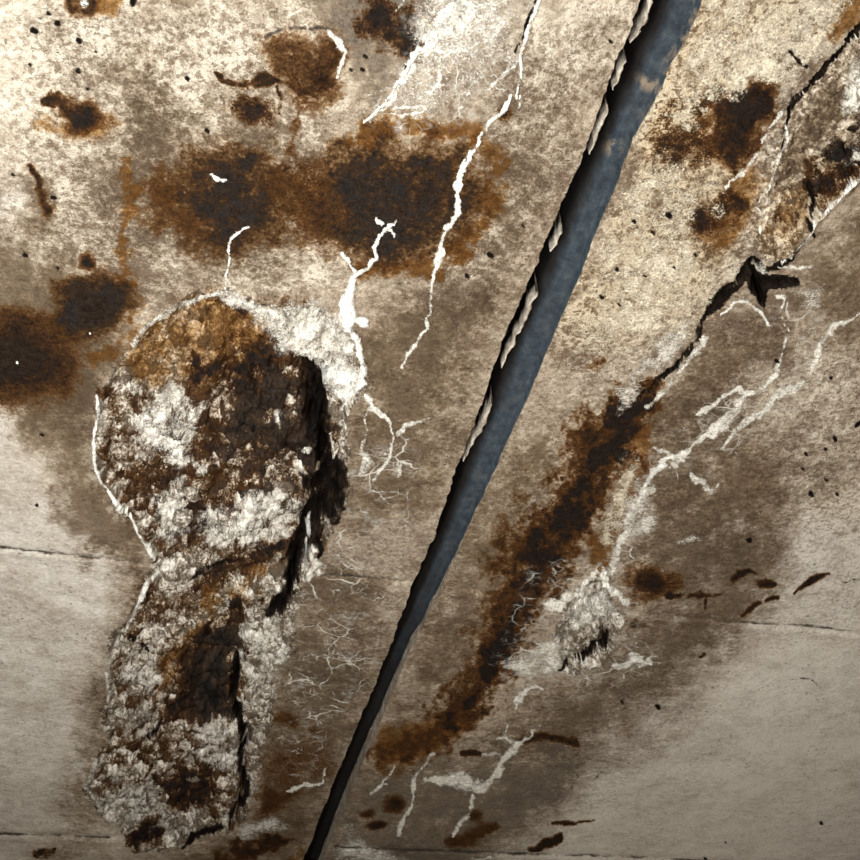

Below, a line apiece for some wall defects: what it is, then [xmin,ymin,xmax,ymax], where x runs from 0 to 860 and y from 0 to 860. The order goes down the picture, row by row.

corrosion [143,123,492,274]
damp [363,0,520,129]
crack [400,0,541,369]
corrosion [646,81,779,177]
crack [724,21,860,235]
corrosion [0,254,138,407]
crack [637,241,811,409]
damp [599,284,860,582]
spalling [81,287,373,853]
corrosion [366,375,662,772]
damp [512,684,544,709]
damp [396,718,550,860]